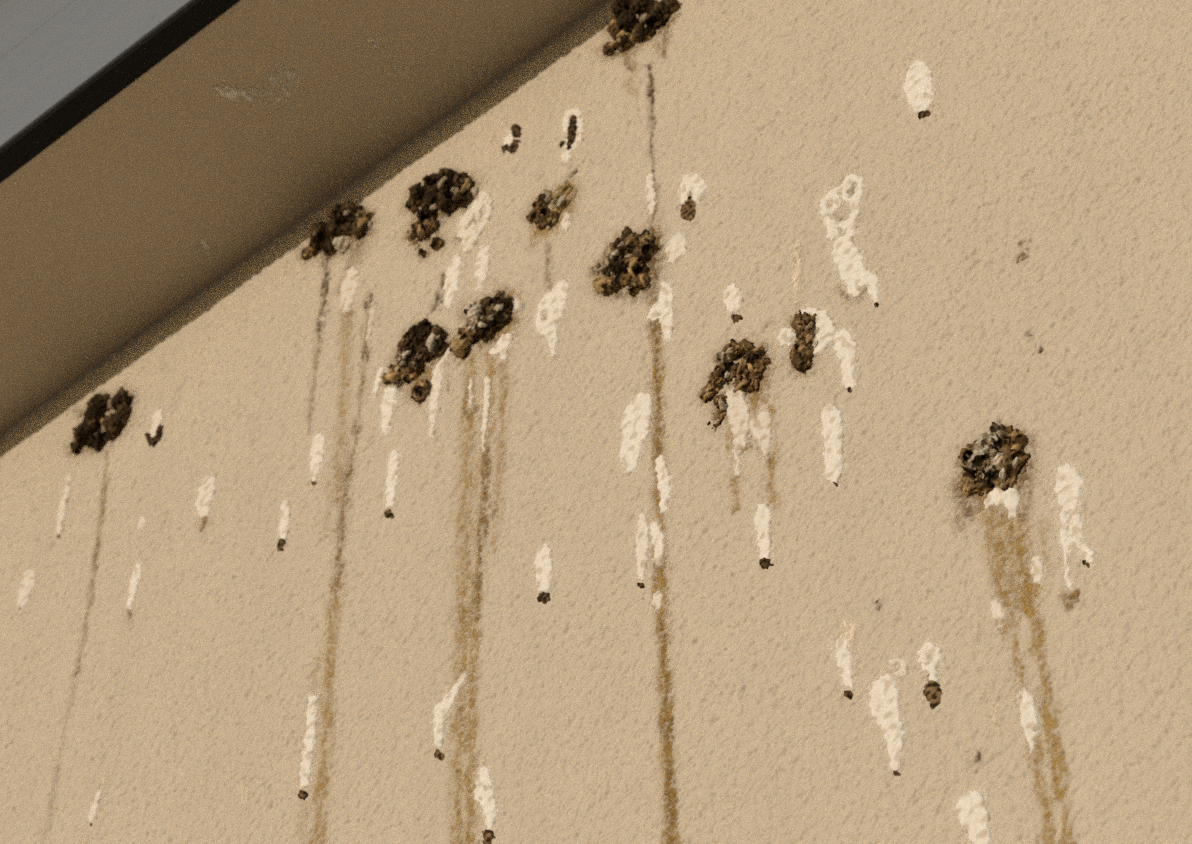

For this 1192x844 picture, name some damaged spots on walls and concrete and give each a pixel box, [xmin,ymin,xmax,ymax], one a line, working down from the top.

damp [625,48,655,120]
damp [316,255,330,335]
damp [651,319,666,532]
damp [310,403,358,844]
damp [451,358,507,844]
damp [652,556,679,844]
damp [962,497,1076,844]